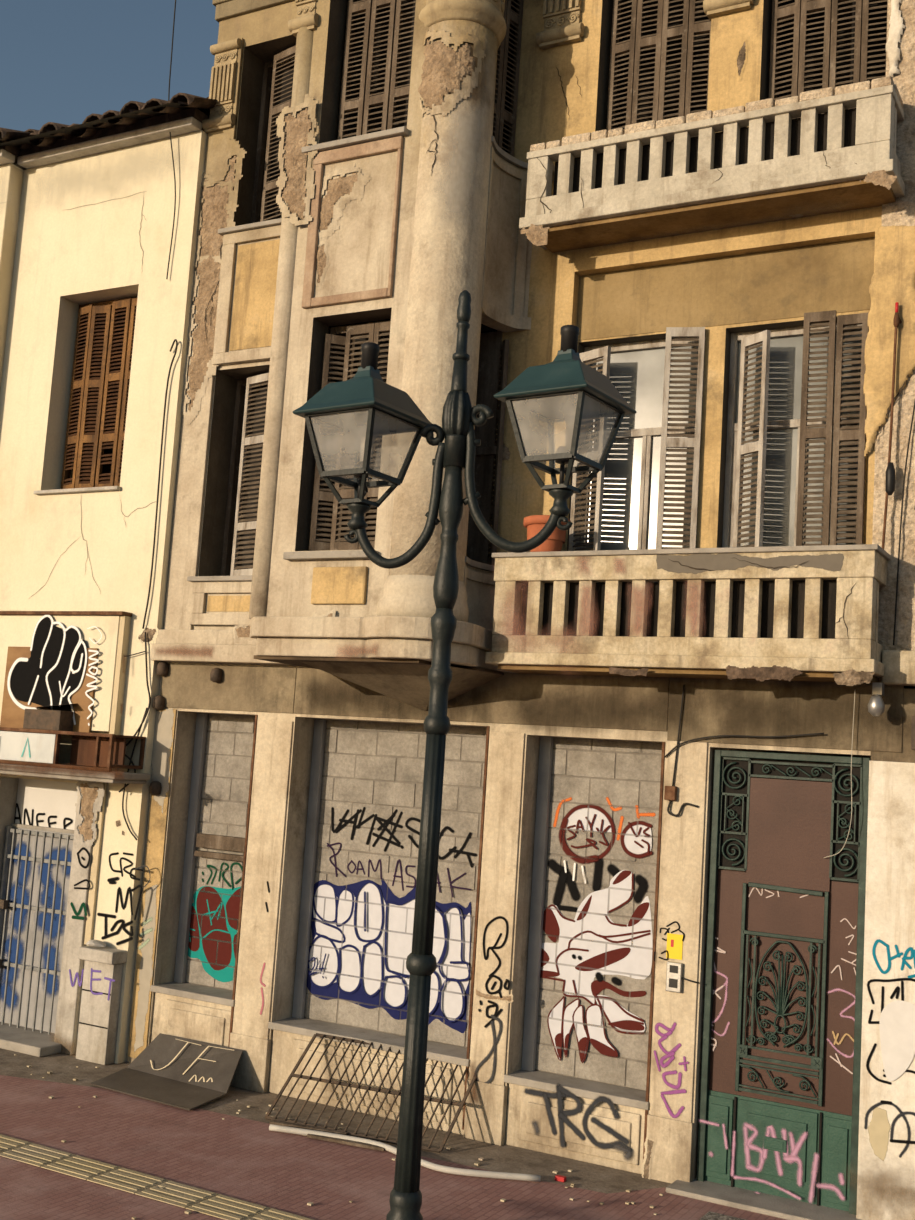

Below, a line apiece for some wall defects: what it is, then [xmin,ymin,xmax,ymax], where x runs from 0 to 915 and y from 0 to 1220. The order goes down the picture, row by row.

flaking render [418,30,486,117]
flaking render [886,0,905,78]
crack [426,108,438,171]
flaking render [276,94,372,287]
flaking render [181,138,247,425]
flaking render [863,225,915,456]
crack [32,509,101,596]
peeling [656,553,844,574]
flaking render [726,665,803,682]